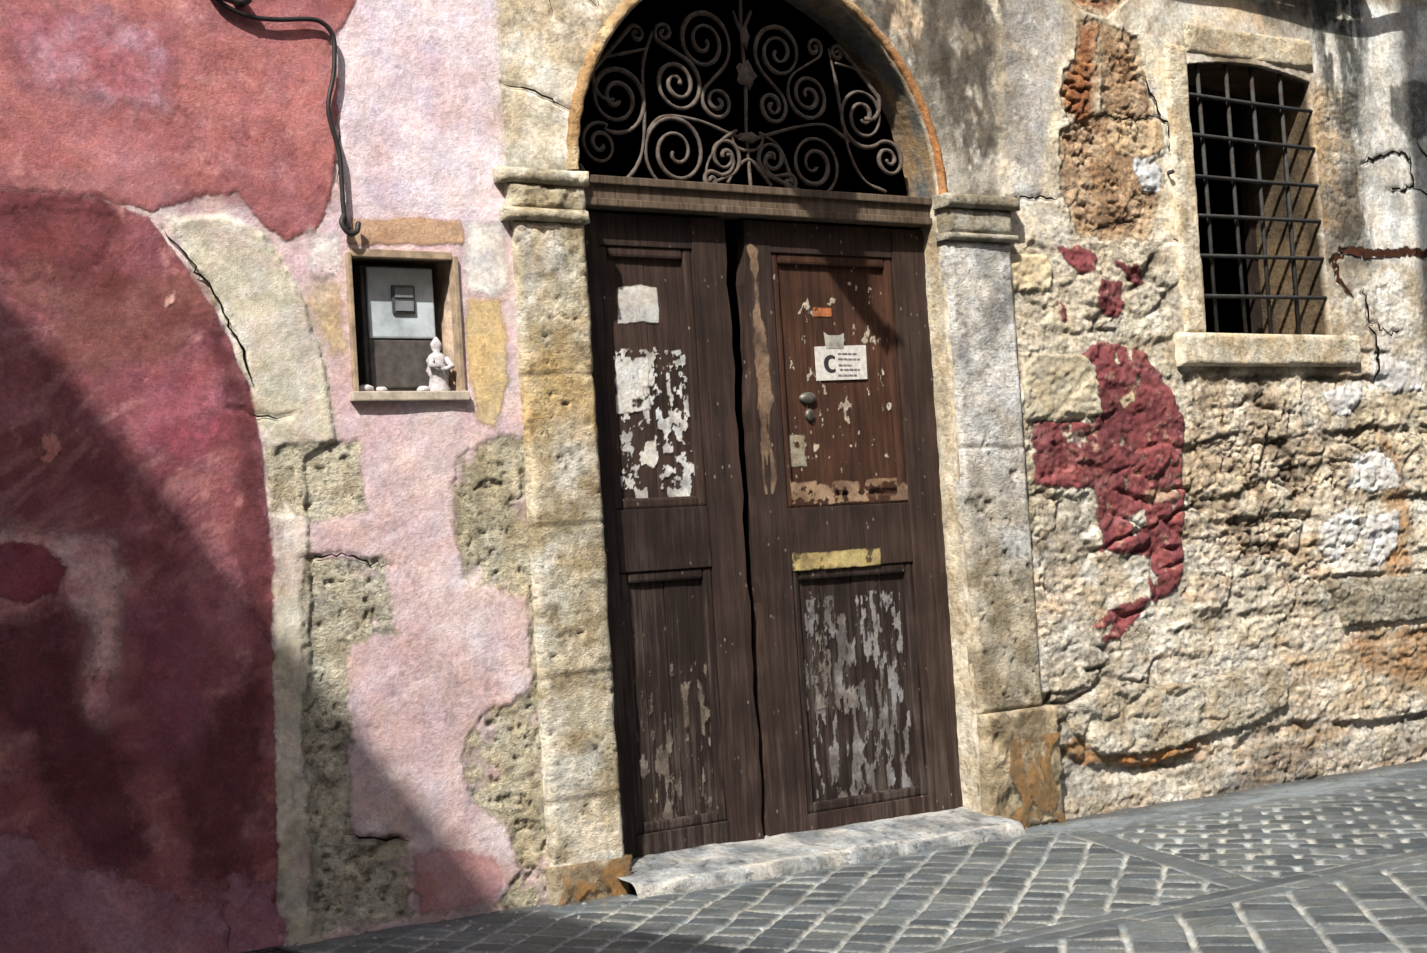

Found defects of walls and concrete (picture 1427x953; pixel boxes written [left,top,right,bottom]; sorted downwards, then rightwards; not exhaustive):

spalling [1057,0,1165,317]
water stain [1252,0,1369,262]
crack [1331,246,1427,383]
crack [1362,143,1427,195]
flaking render [0,0,509,953]
flaking render [1031,340,1185,642]
spalling [301,435,550,935]